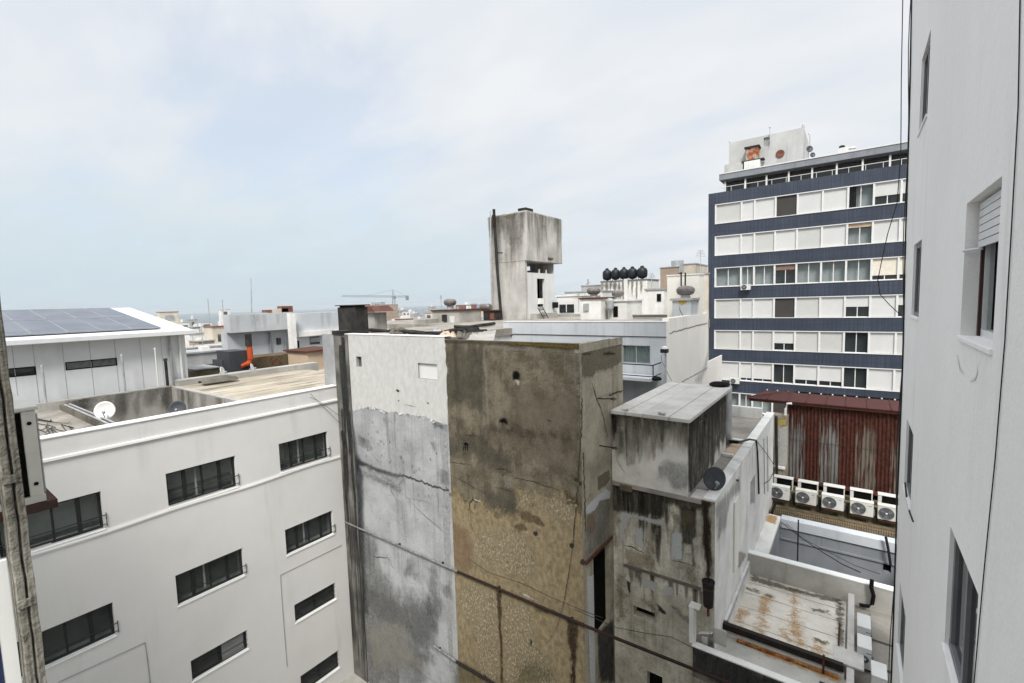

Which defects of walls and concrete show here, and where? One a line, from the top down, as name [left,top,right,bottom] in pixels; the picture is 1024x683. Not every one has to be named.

leakage [339,337,432,683]
crack [371,384,624,537]
leakage [447,347,585,518]
peeling [449,485,586,683]
leakage [611,395,726,565]
rust [781,591,822,654]